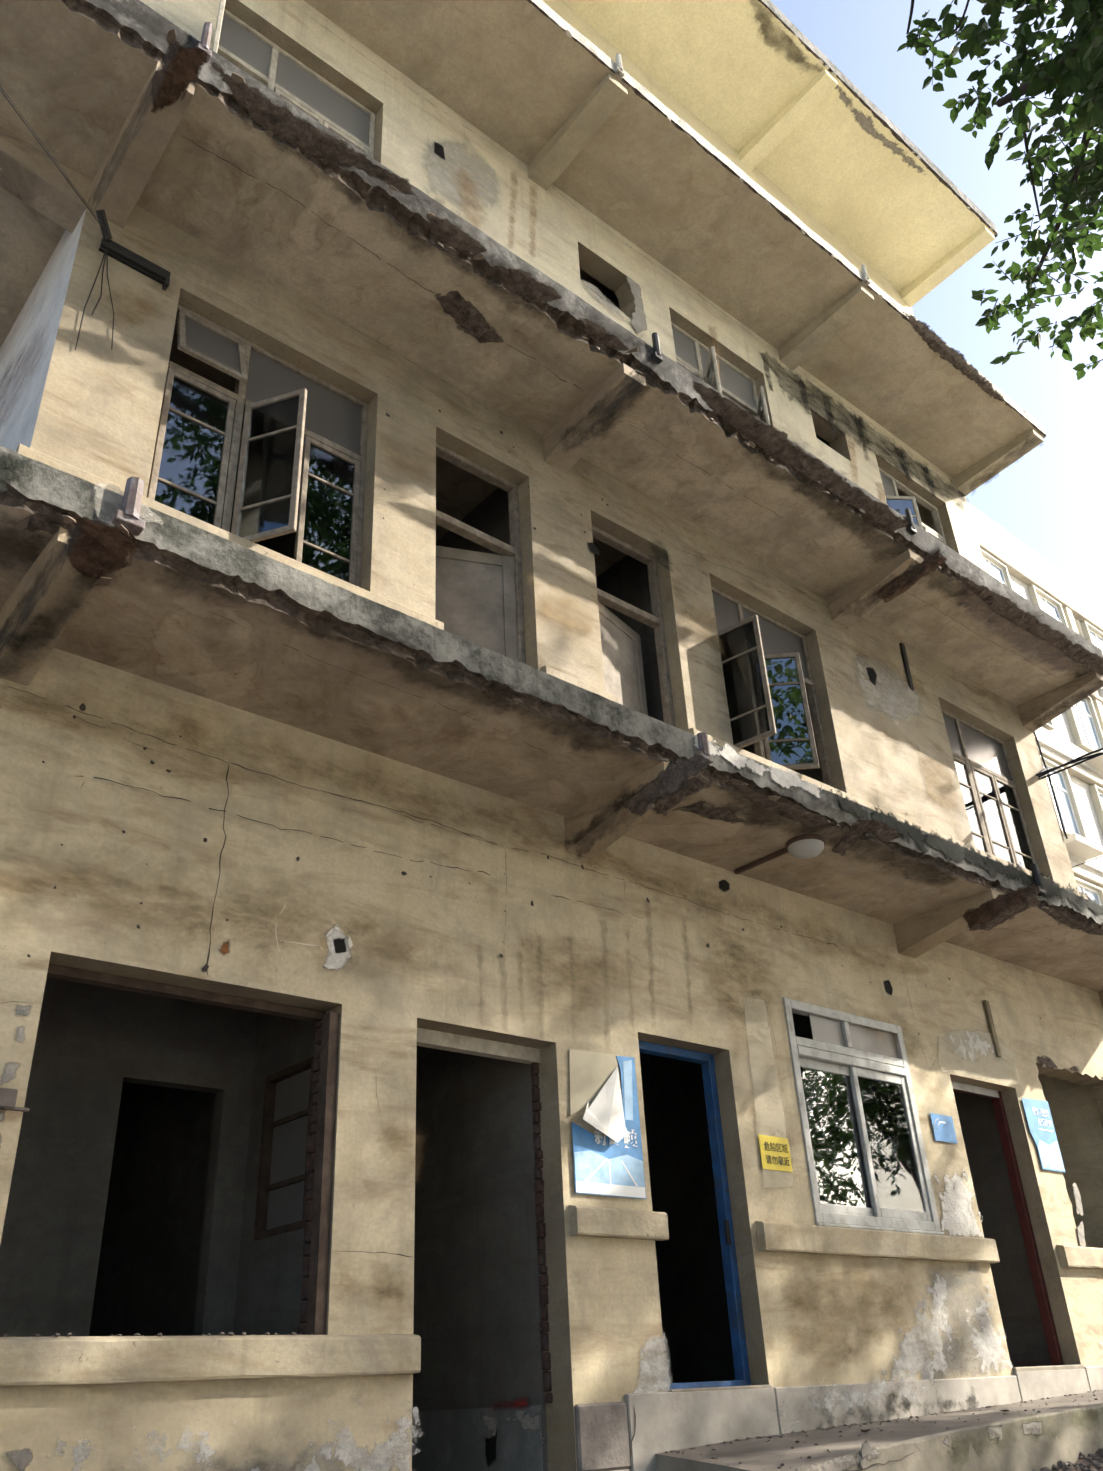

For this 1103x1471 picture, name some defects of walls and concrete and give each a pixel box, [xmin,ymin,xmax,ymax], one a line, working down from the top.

leakage [757,13,810,68]
spalling [61,0,1103,675]
leakage [764,357,1035,510]
leakage [0,529,80,673]
spalling [0,479,1103,935]
crack [8,686,835,975]
peeling [934,1166,983,1237]
flaking render [634,1338,670,1393]
flaking render [7,1448,32,1471]